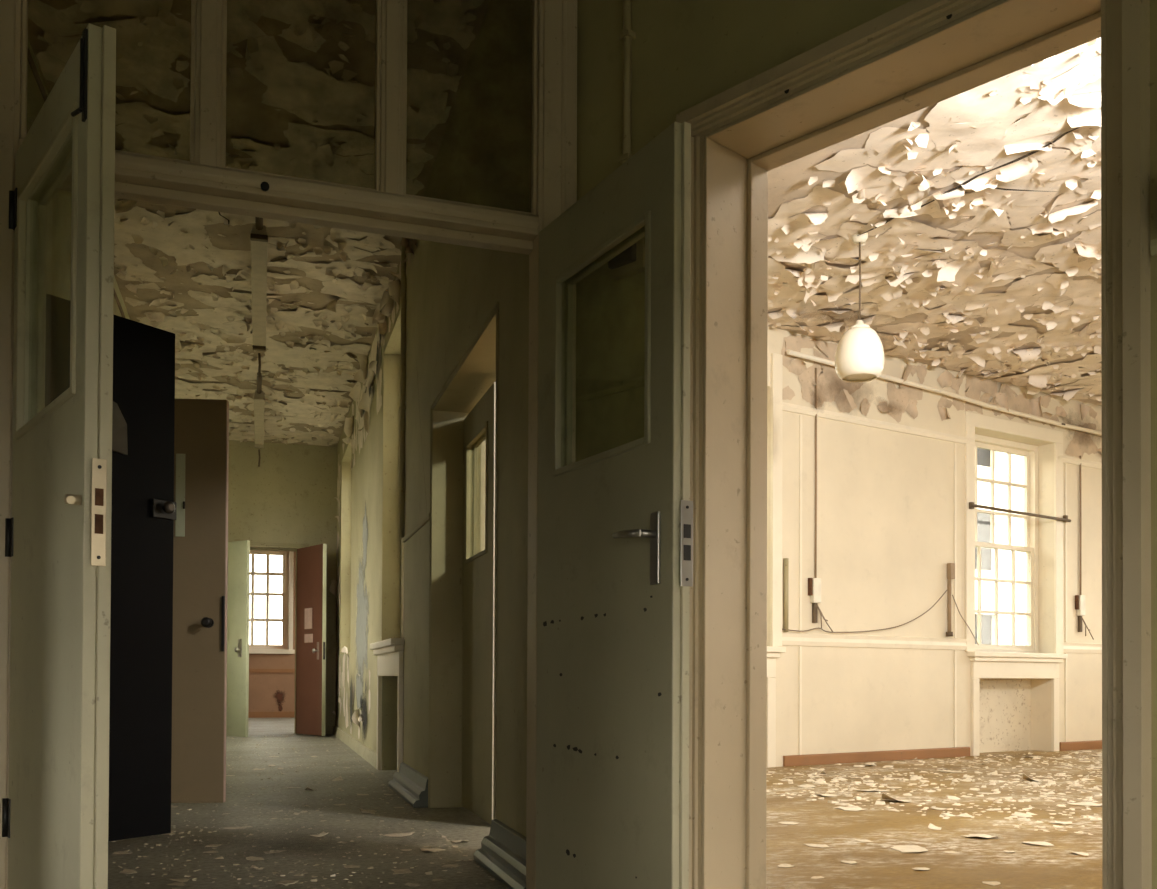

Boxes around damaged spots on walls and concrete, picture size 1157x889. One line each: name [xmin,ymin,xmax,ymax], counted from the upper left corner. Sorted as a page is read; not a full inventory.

peeling [28,0,191,161]
peeling [226,0,376,189]
peeling [406,0,485,195]
peeling [767,37,1102,458]
crack [921,127,1080,207]
peeling [114,198,416,738]